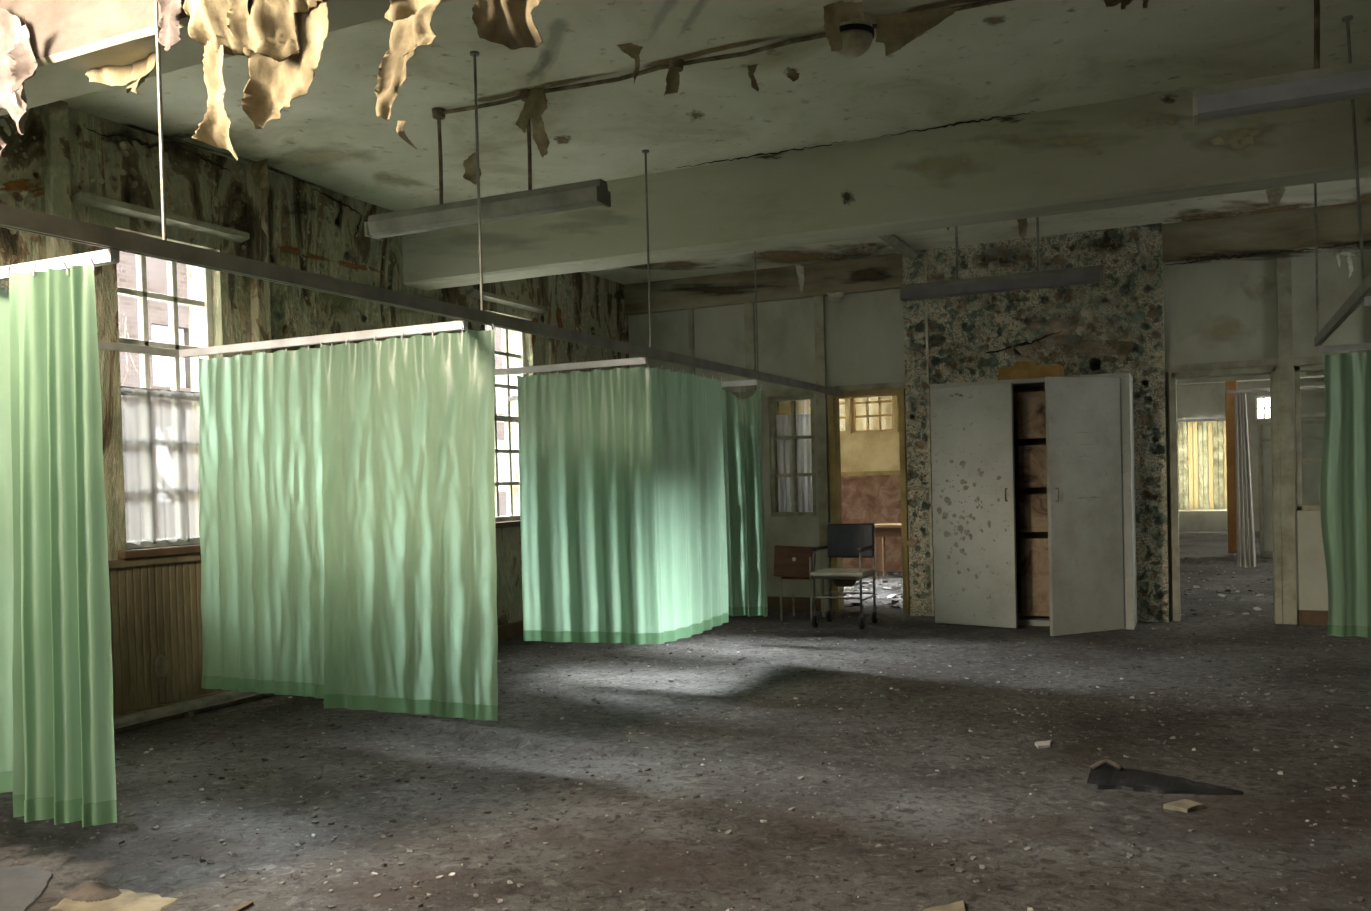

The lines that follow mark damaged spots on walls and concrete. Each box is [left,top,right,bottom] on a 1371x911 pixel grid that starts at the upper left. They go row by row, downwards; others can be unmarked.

crack [87,128,231,172]
leakage [103,124,343,255]
leakage [228,273,251,310]